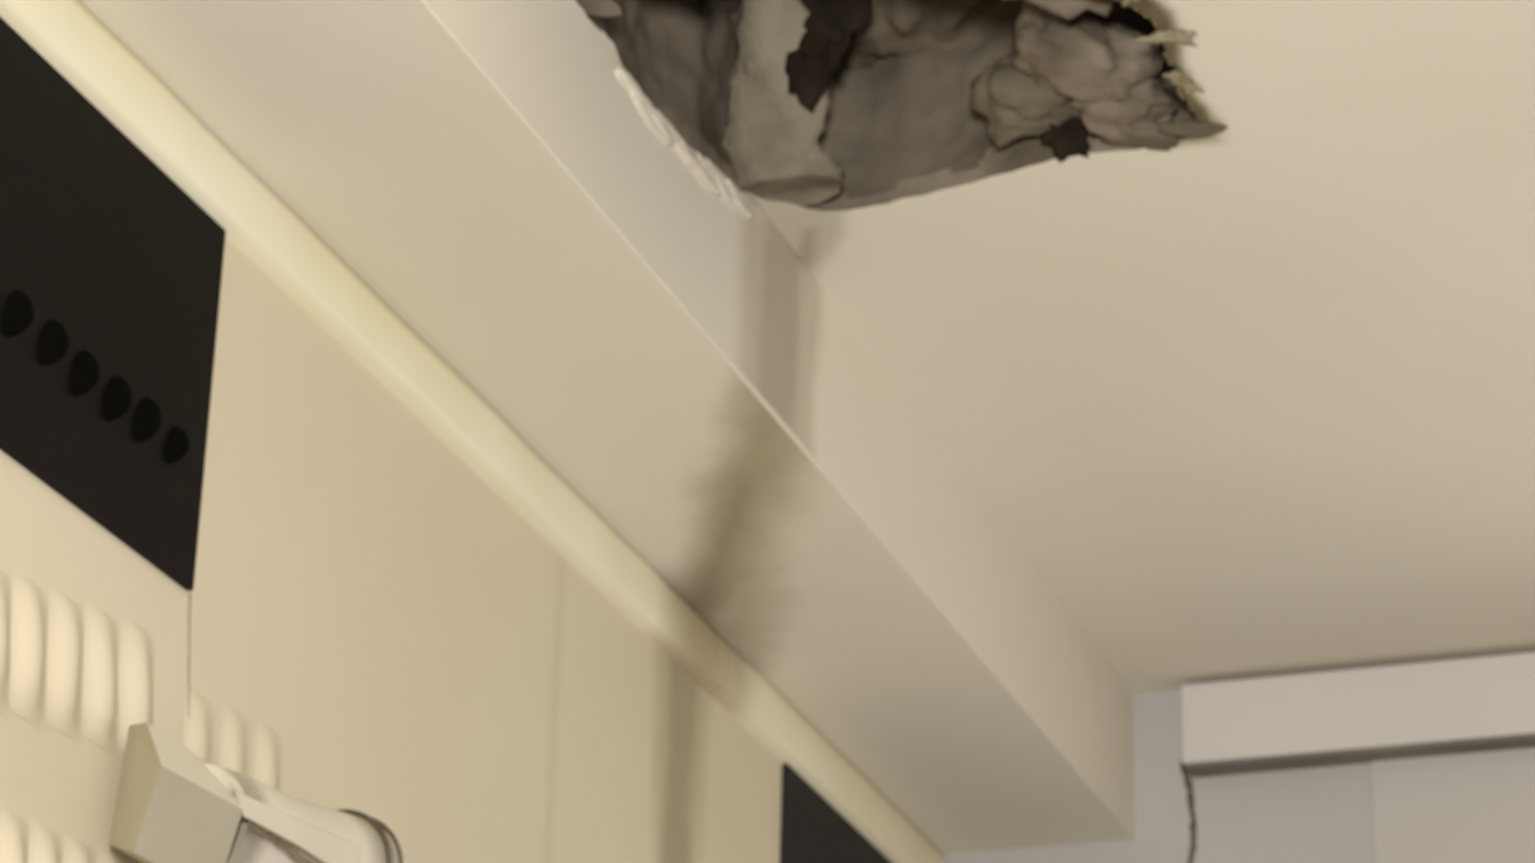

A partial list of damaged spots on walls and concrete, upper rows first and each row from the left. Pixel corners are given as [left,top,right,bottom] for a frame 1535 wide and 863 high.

flaking render [576,0,622,18]
flaking render [1116,0,1227,142]
crack [185,593,193,716]
crack [1179,761,1197,863]